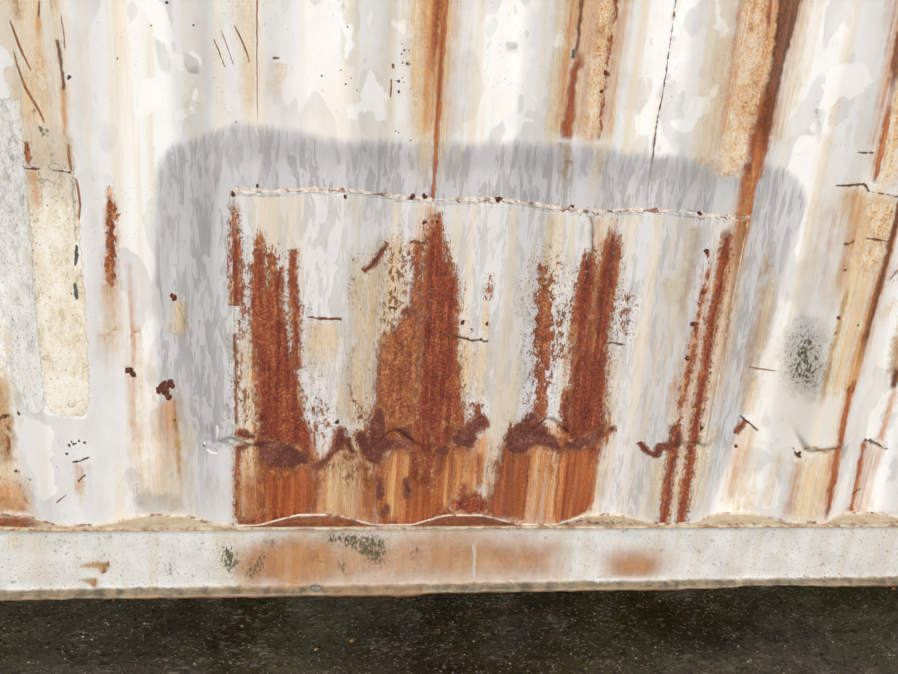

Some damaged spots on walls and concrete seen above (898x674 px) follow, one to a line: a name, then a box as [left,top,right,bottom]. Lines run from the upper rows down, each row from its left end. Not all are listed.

peeling [0,38,94,506]
rust [104,185,121,287]
rust [226,0,639,527]
rust [636,0,801,523]
rust [824,189,898,513]
rust [861,5,898,183]